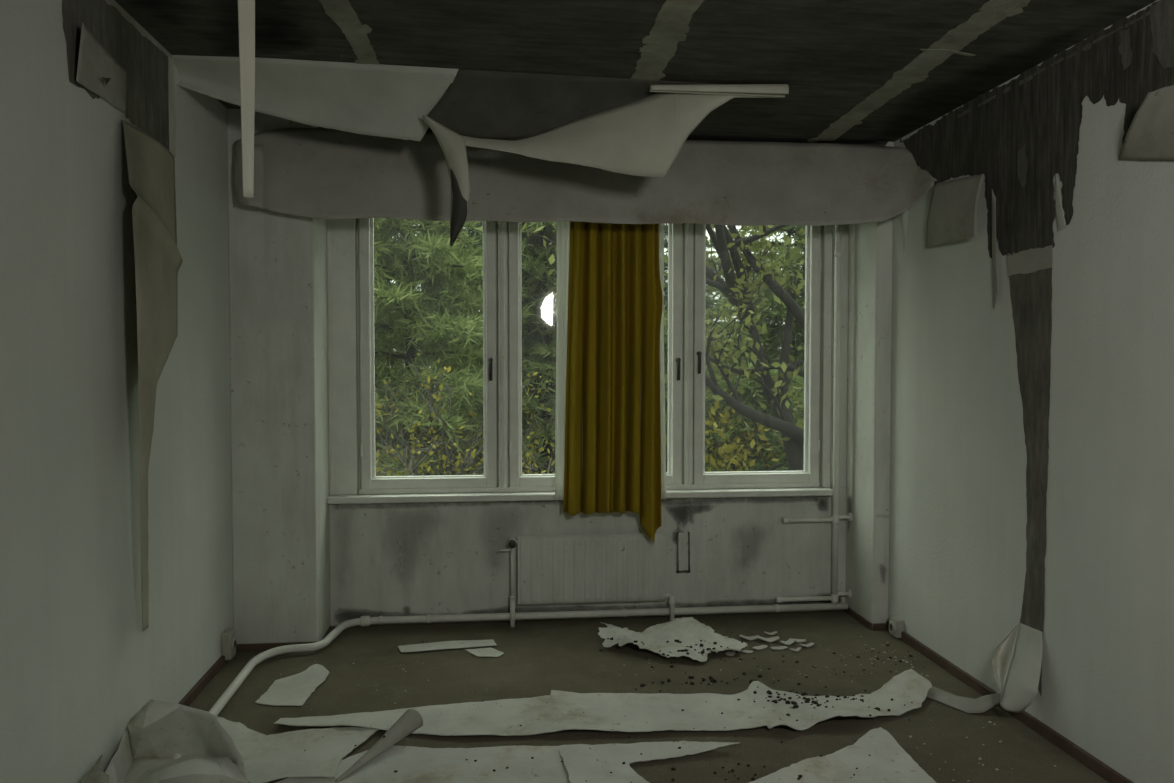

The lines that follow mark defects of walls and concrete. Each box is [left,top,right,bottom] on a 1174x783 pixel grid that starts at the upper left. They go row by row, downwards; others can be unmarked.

flaking render [900,0,1174,632]